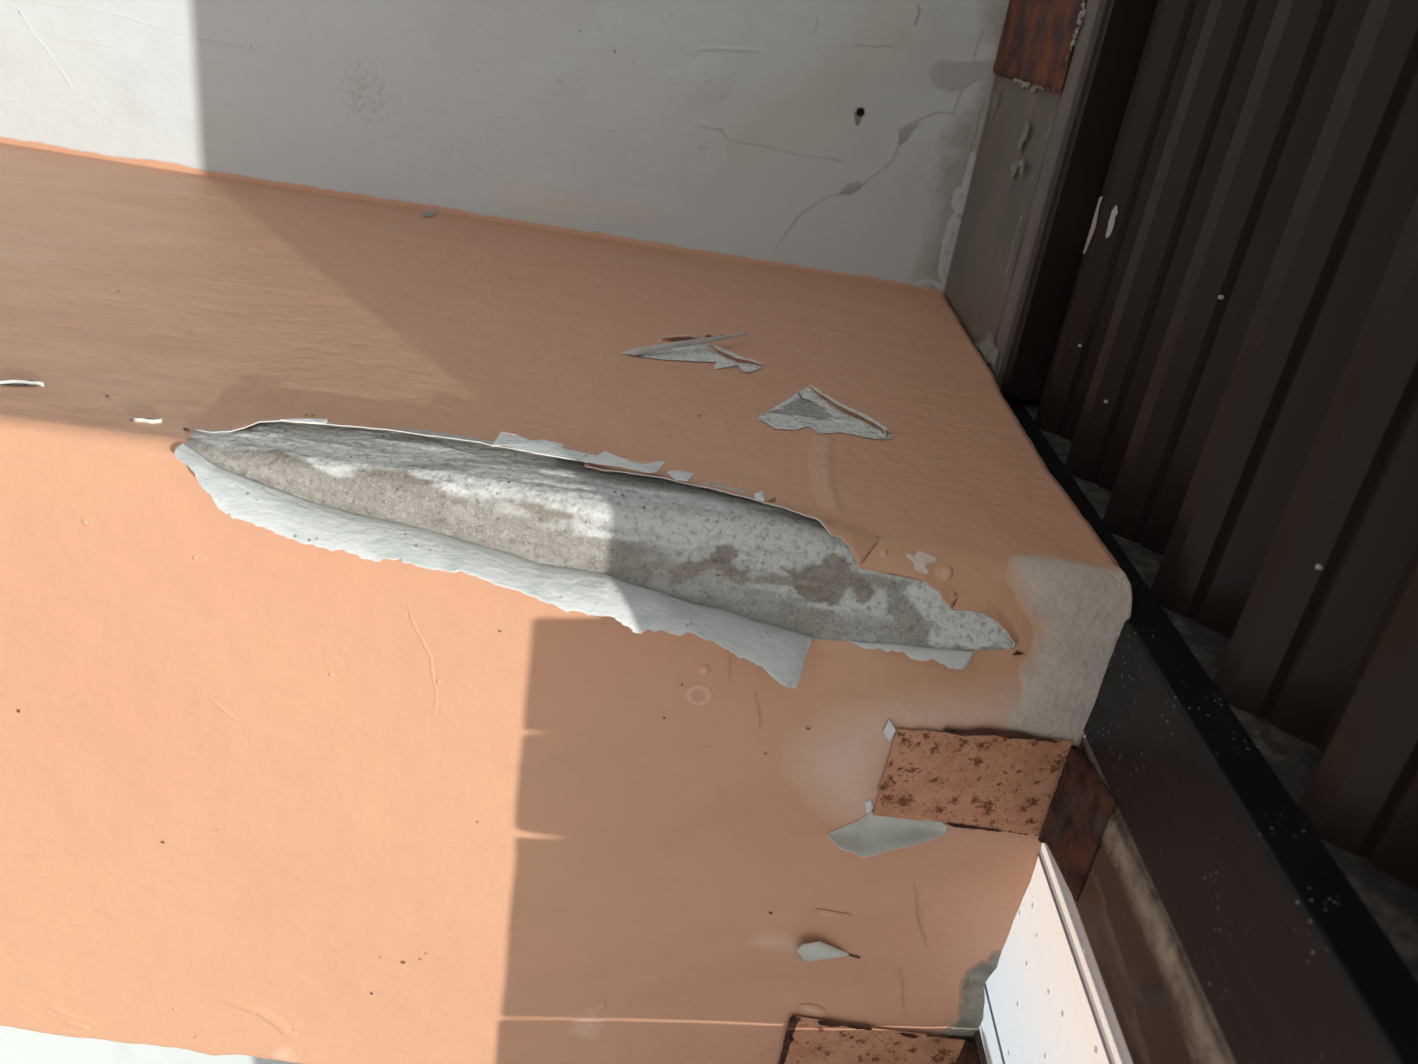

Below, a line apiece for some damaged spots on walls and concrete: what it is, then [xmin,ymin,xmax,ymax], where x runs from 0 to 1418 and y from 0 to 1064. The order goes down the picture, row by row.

peeling [621,333,764,372]
peeling [757,385,893,440]
peeling [174,418,1132,747]
corrosion [873,728,1073,836]
peeling [827,800,948,858]
peeling [797,941,861,962]
corrosion [779,1015,974,1064]